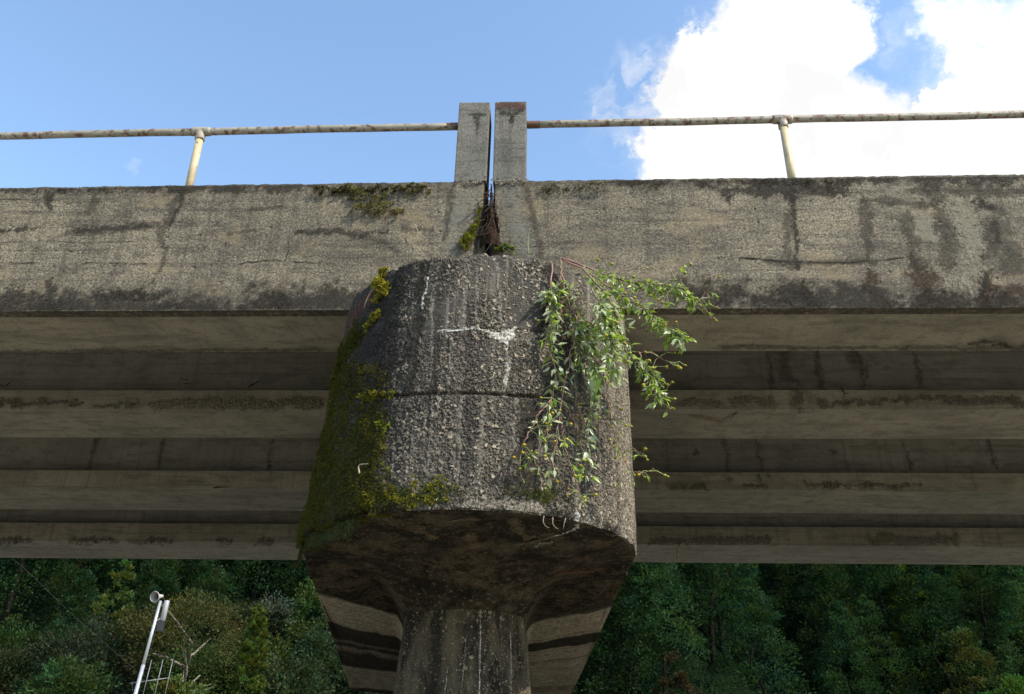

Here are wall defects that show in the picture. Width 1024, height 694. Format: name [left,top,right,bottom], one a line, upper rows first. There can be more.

water stain [1,188,71,210]
water stain [66,185,323,267]
water stain [294,227,392,250]
water stain [504,182,564,368]
crack [739,256,905,264]
water stain [664,176,1024,307]
water stain [0,259,580,581]